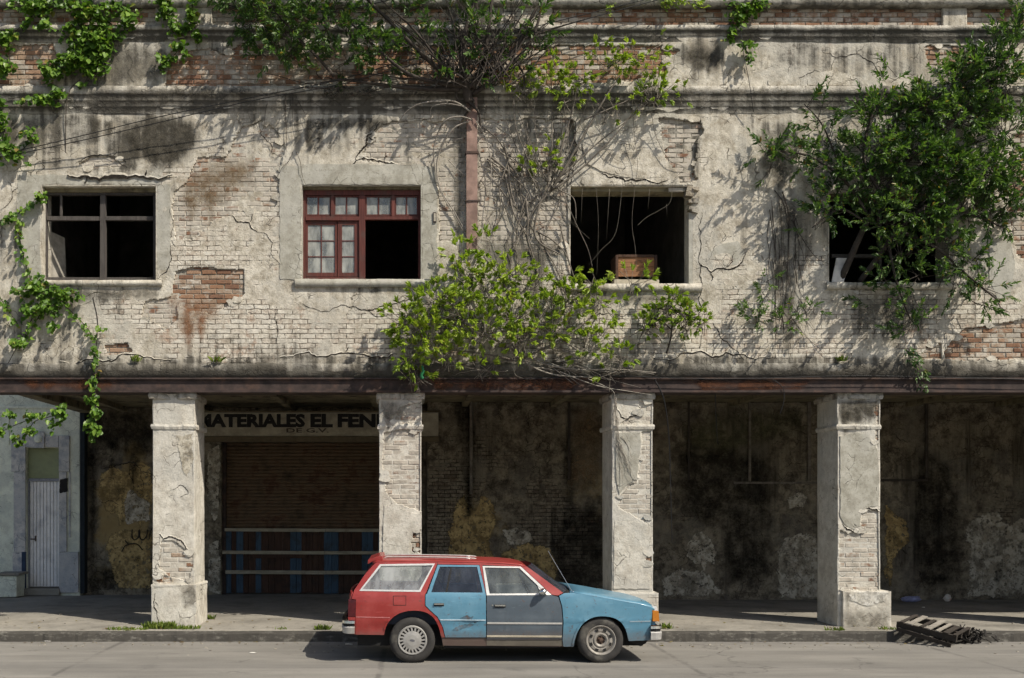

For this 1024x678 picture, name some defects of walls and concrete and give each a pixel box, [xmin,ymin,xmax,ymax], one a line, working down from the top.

leakage [91,121,111,136]
leakage [127,121,195,166]
spalling [141,267,245,328]
spalling [172,120,286,241]
crack [232,214,279,263]
flaking render [582,116,703,214]
crack [652,214,772,361]
leakage [89,412,153,528]
spalling [379,403,422,556]
leakage [678,446,771,580]
leakage [842,400,878,432]
flaking render [839,403,909,591]